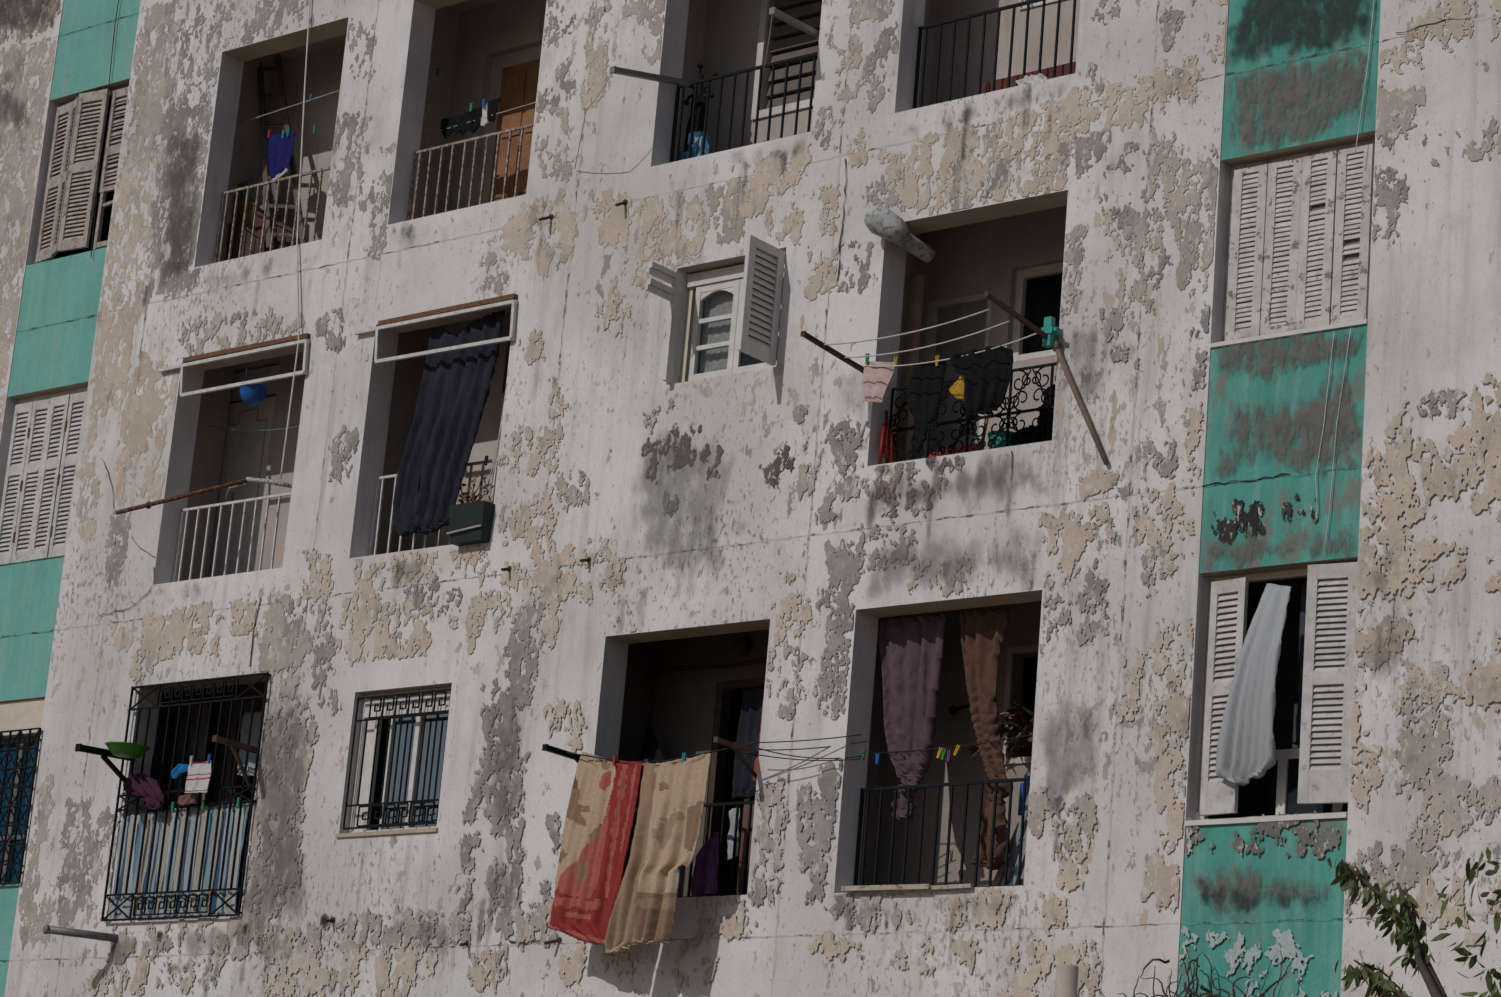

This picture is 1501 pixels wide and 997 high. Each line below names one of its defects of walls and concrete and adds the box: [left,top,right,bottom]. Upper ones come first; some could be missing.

leakage [1228,0,1375,59]
leakage [165,136,197,272]
peeling [332,111,392,261]
peeling [479,0,1501,997]
peeling [18,328,640,997]